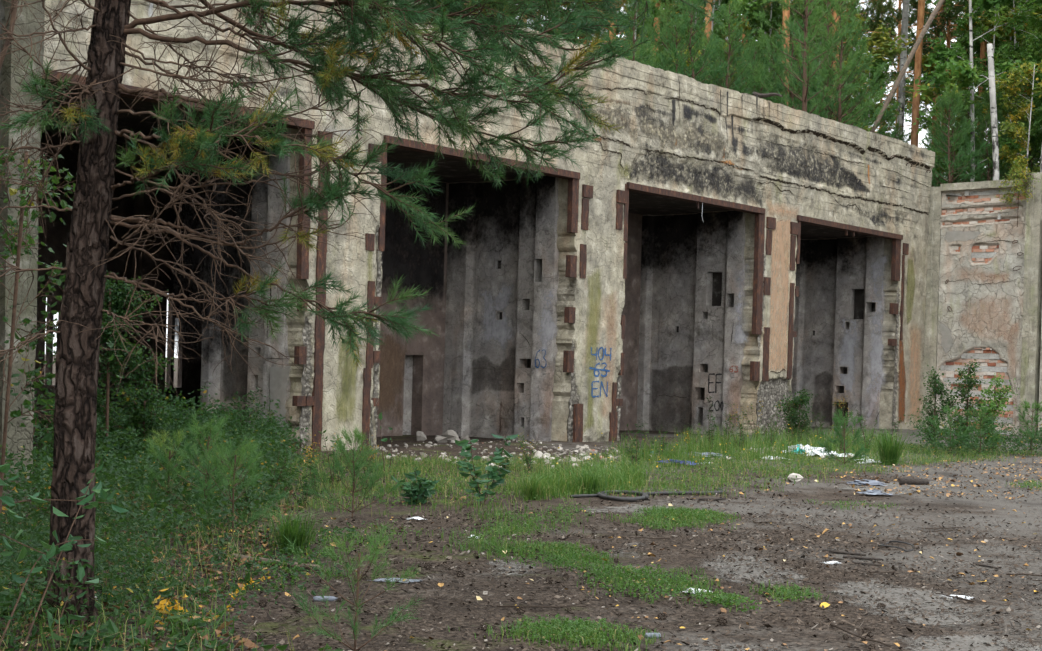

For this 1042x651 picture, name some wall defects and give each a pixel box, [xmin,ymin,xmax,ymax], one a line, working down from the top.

crack [576,76,724,122]
crack [541,118,932,215]
leakage [780,155,868,192]
flaking render [940,186,1027,229]
flaking render [948,241,1000,266]
flaking render [937,346,1015,435]